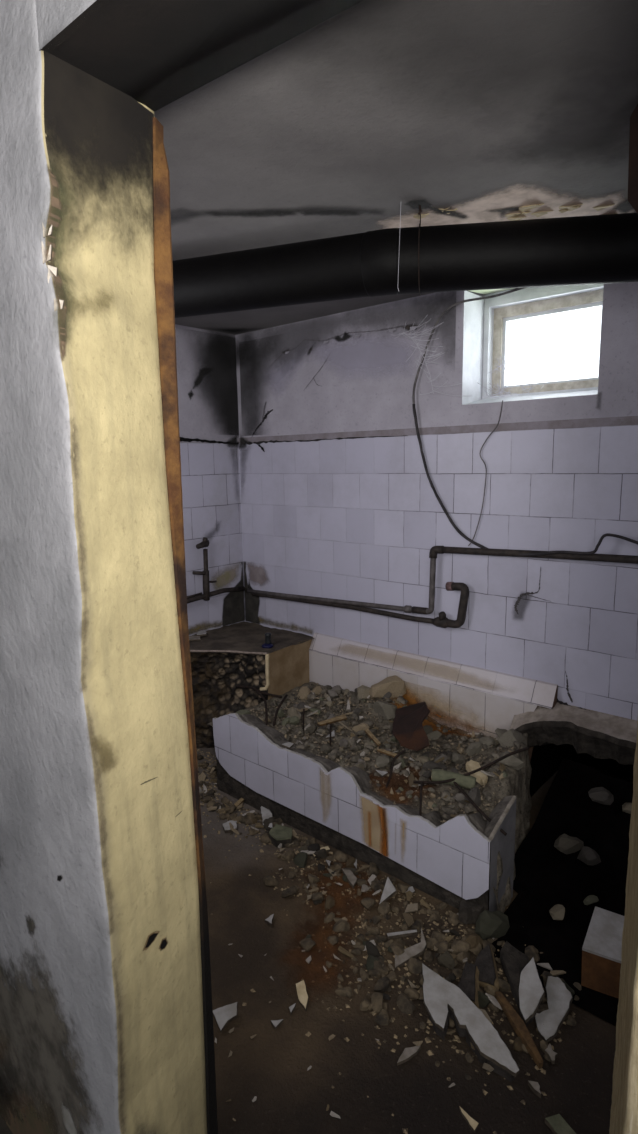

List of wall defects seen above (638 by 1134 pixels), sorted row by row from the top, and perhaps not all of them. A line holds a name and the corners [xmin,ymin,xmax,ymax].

flaking render [379,186,634,229]
crack [180,402,394,452]
rust [392,688,476,751]
rust [361,769,432,857]